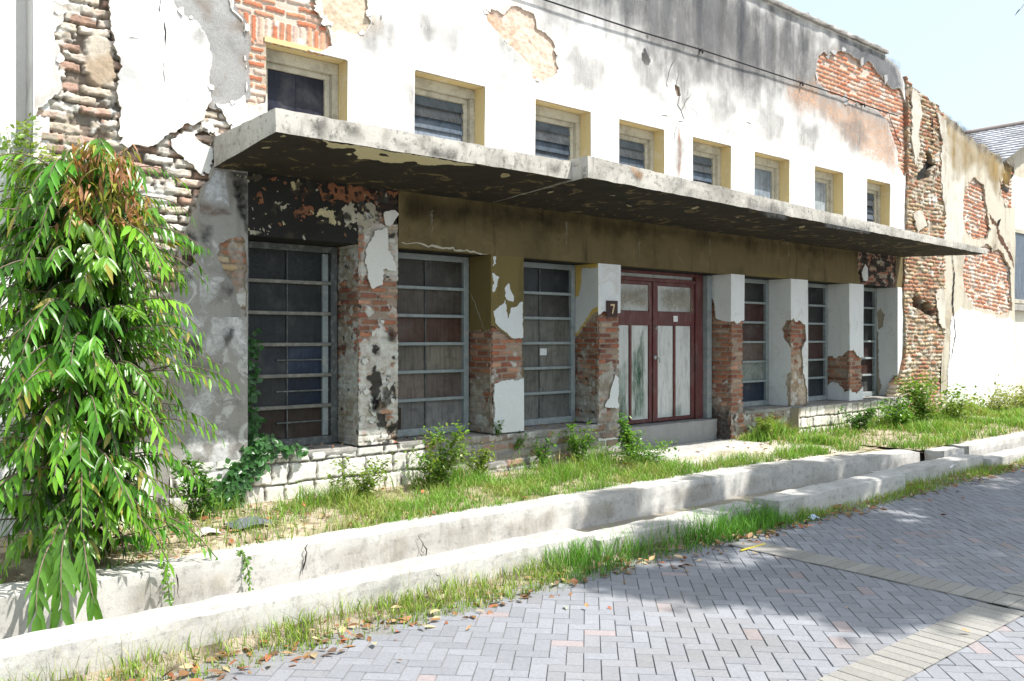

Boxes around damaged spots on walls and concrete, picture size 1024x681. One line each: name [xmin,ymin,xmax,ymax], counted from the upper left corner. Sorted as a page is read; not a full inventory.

flaking render [36,0,399,447]
peeling [323,140,475,166]
flaking render [483,6,559,81]
water stain [599,0,900,162]
flaking render [815,47,931,180]
flaking render [963,178,1013,315]
flaking render [999,172,1013,208]
flaking render [469,256,524,434]
flaking render [575,267,619,426]
flaking render [783,319,807,406]
flaking render [828,346,862,393]